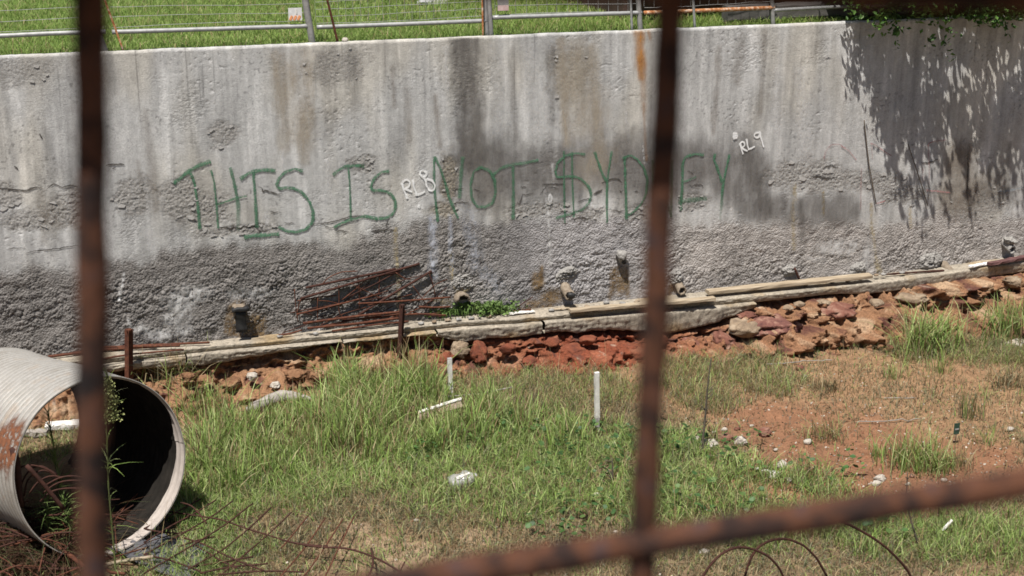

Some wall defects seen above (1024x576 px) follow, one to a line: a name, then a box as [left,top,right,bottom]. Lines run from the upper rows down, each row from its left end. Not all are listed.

corrosion [635,30,644,69]
water stain [454,37,578,252]
crack [0,166,74,192]